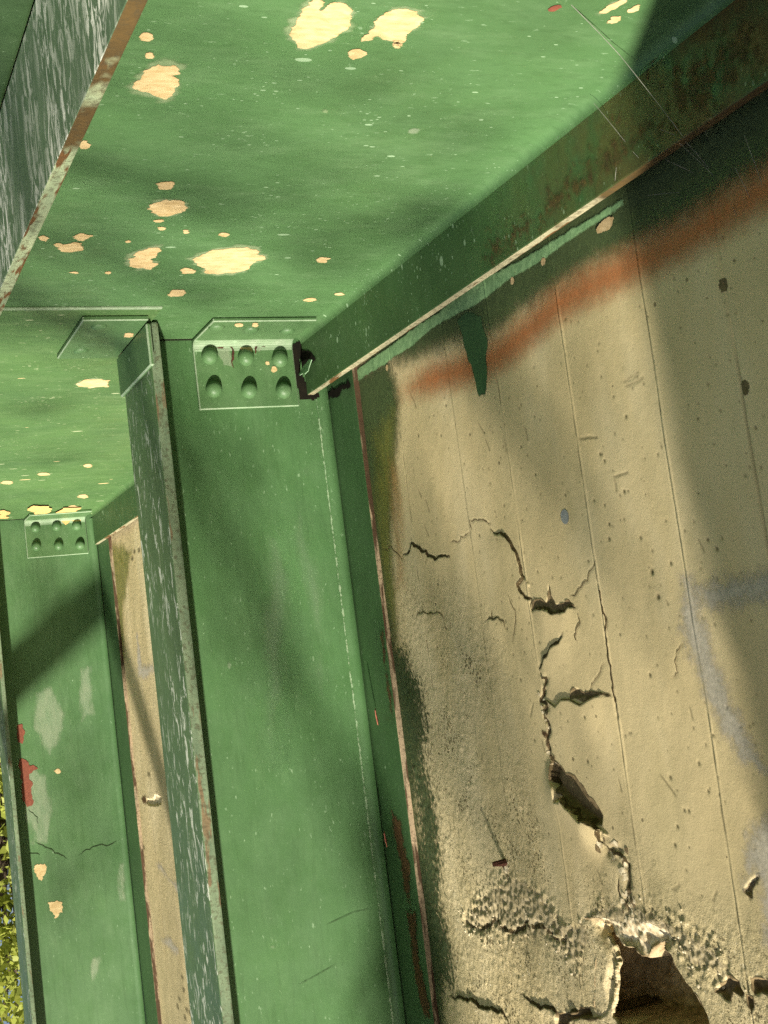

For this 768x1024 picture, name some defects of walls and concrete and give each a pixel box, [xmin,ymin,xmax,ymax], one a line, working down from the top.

peeling [286,0,354,50]
peeling [348,8,424,60]
peeling [599,0,639,24]
peeling [129,33,184,102]
peeling [147,182,188,230]
peeling [38,233,93,252]
peeling [125,240,161,270]
peeling [181,233,267,276]
crack [386,519,532,635]
crack [538,560,618,770]
crack [28,809,115,859]
spalling [468,838,768,1024]